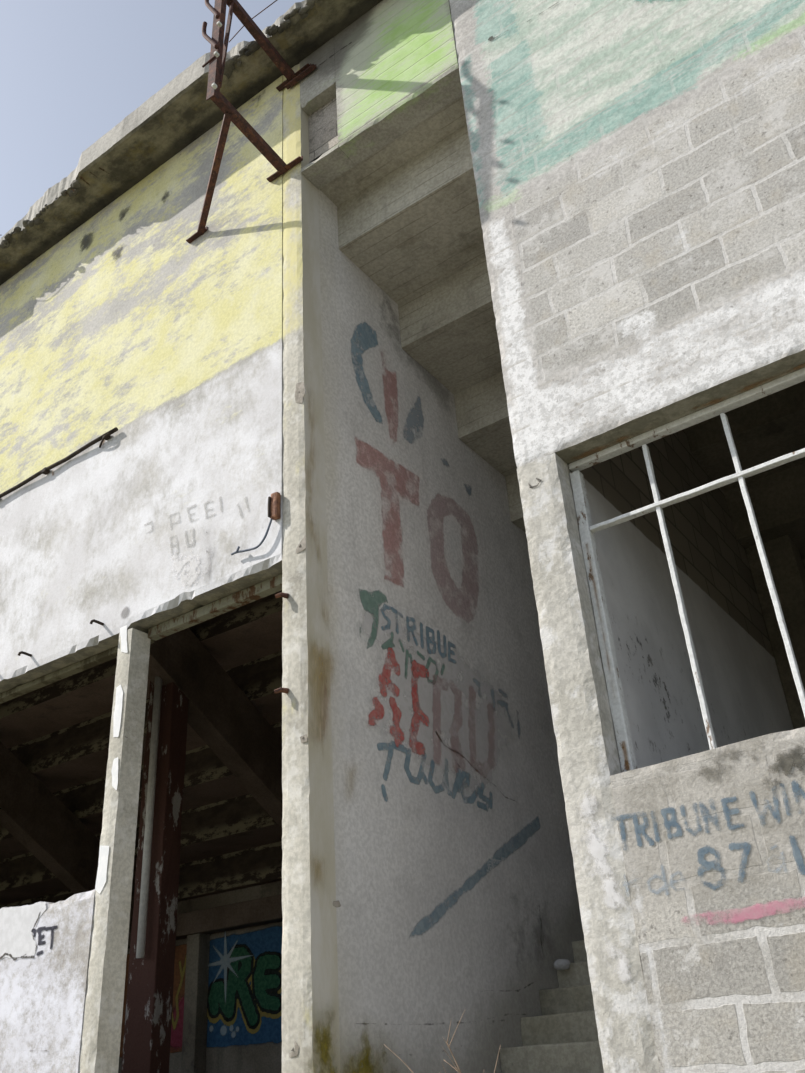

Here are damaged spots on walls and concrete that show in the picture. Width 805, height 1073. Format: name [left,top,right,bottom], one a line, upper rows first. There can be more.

water stain [81,233,92,251]
peeling [120,625,128,653]
peeling [113,684,123,737]
peeling [95,845,109,894]
crack [0,903,47,960]